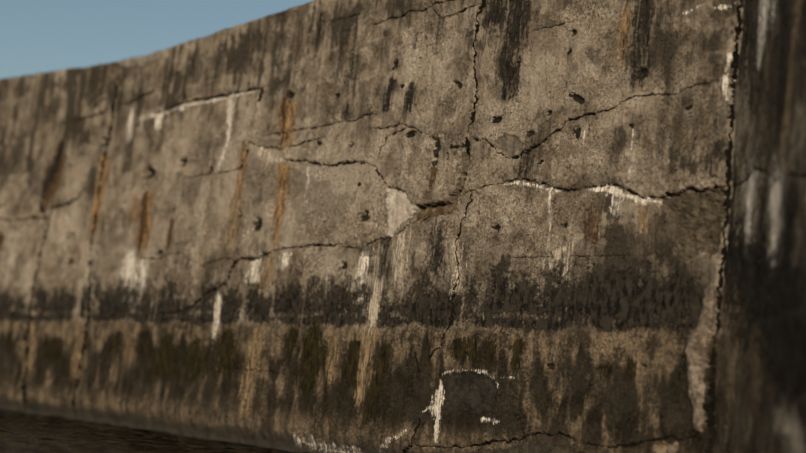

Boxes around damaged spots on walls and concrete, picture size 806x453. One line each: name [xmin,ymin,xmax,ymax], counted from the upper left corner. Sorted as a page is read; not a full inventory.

damp [126,89,257,173]
corrosion [277,96,299,149]
crack [184,112,429,194]
damp [382,77,418,113]
damp [722,0,789,137]
crack [0,74,264,419]
corrosion [130,188,154,256]
crack [139,223,411,315]
corrosion [257,163,294,292]
damp [0,144,707,445]
crack [374,0,806,453]
spalling [443,371,497,415]